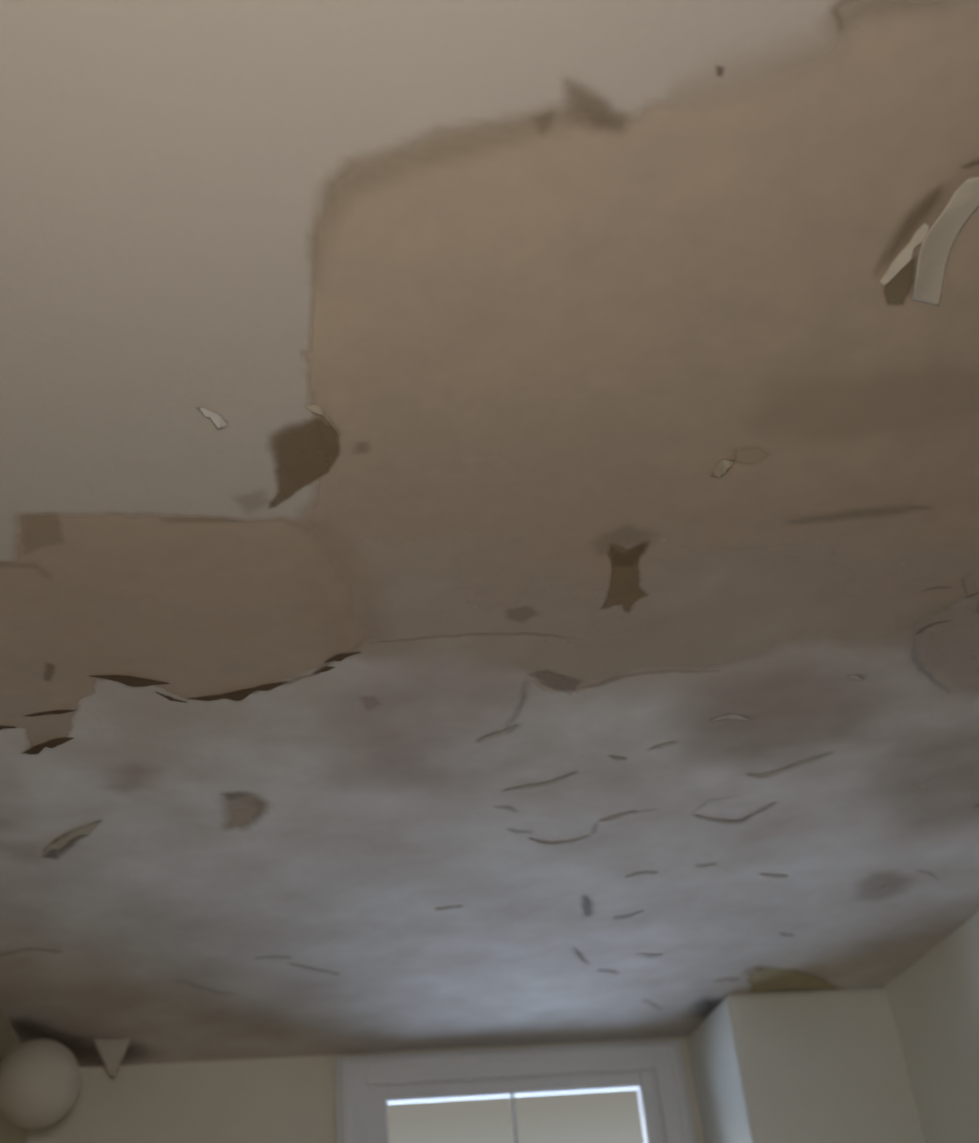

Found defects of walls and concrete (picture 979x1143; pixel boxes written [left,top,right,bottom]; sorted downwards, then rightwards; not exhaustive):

peeling [879,177,979,306]
peeling [603,543,647,611]
peeling [43,821,102,858]
spalling [714,966,836,993]